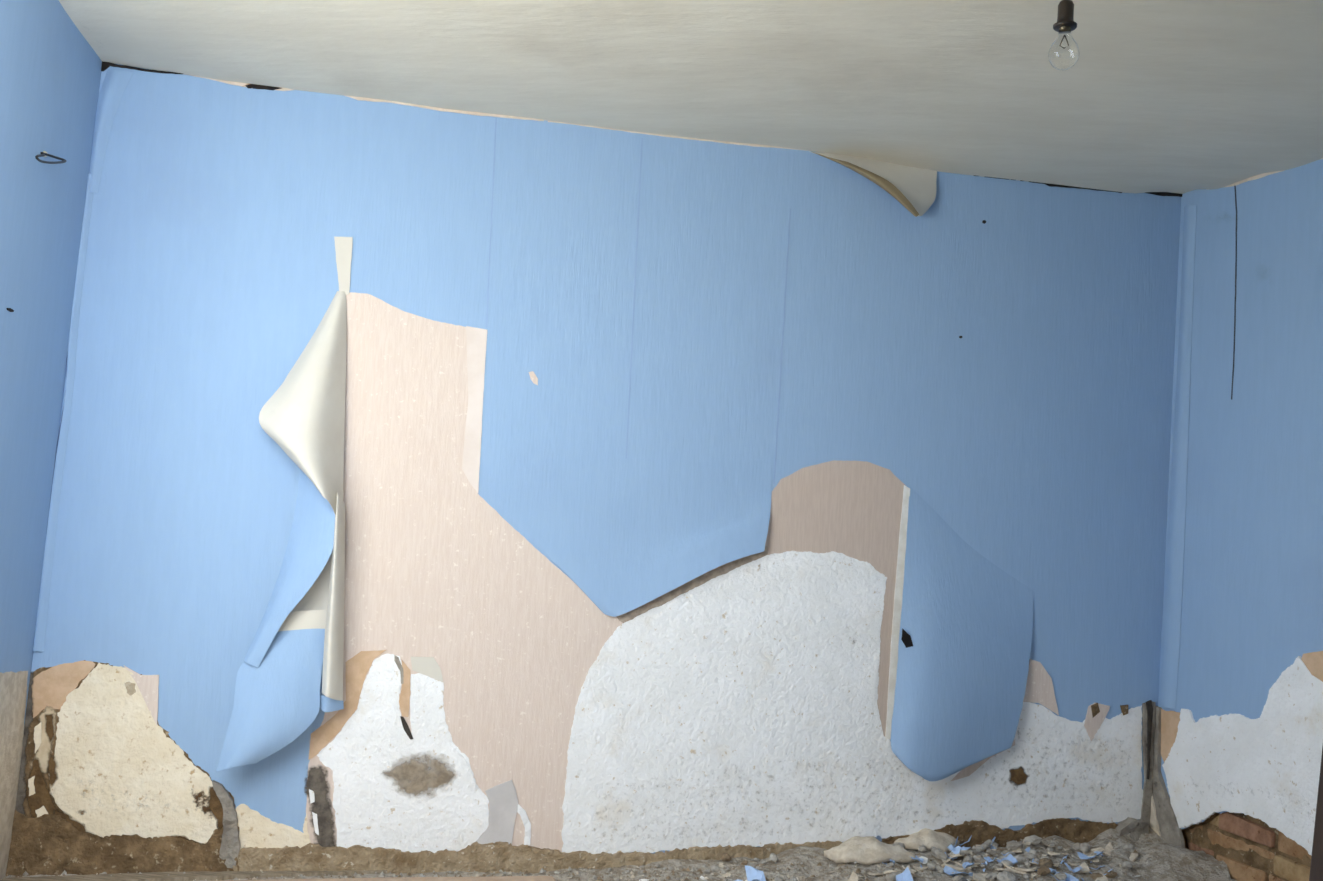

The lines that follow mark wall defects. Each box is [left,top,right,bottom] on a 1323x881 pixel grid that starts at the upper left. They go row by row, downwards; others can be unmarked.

crack [1230,186,1238,400]
flaking render [6,458,1143,881]
flaking render [1161,651,1323,881]